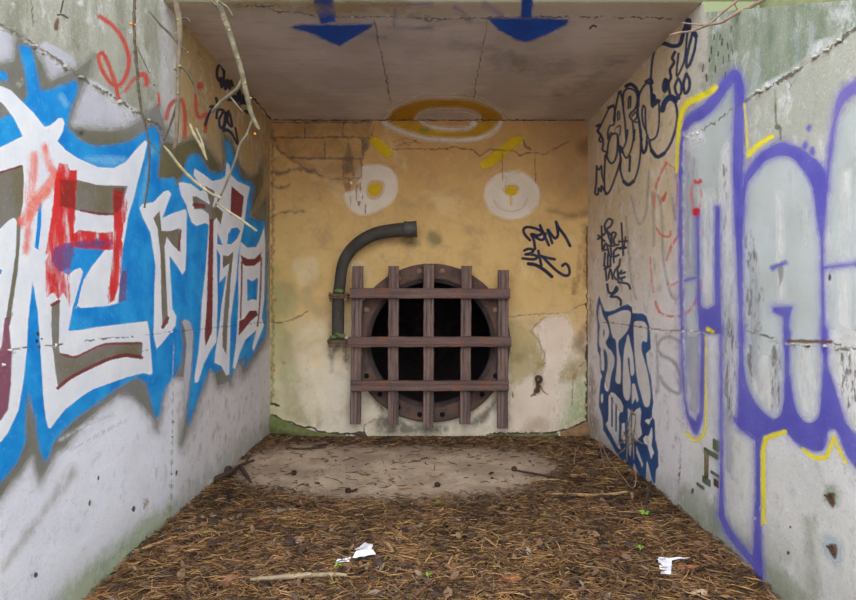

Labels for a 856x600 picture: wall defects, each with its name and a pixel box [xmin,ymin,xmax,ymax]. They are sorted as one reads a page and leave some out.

crack [0,3,162,130]
crack [701,27,856,131]
crack [85,5,672,435]
crack [0,332,63,366]
peeling [507,315,576,433]
crack [747,330,856,351]